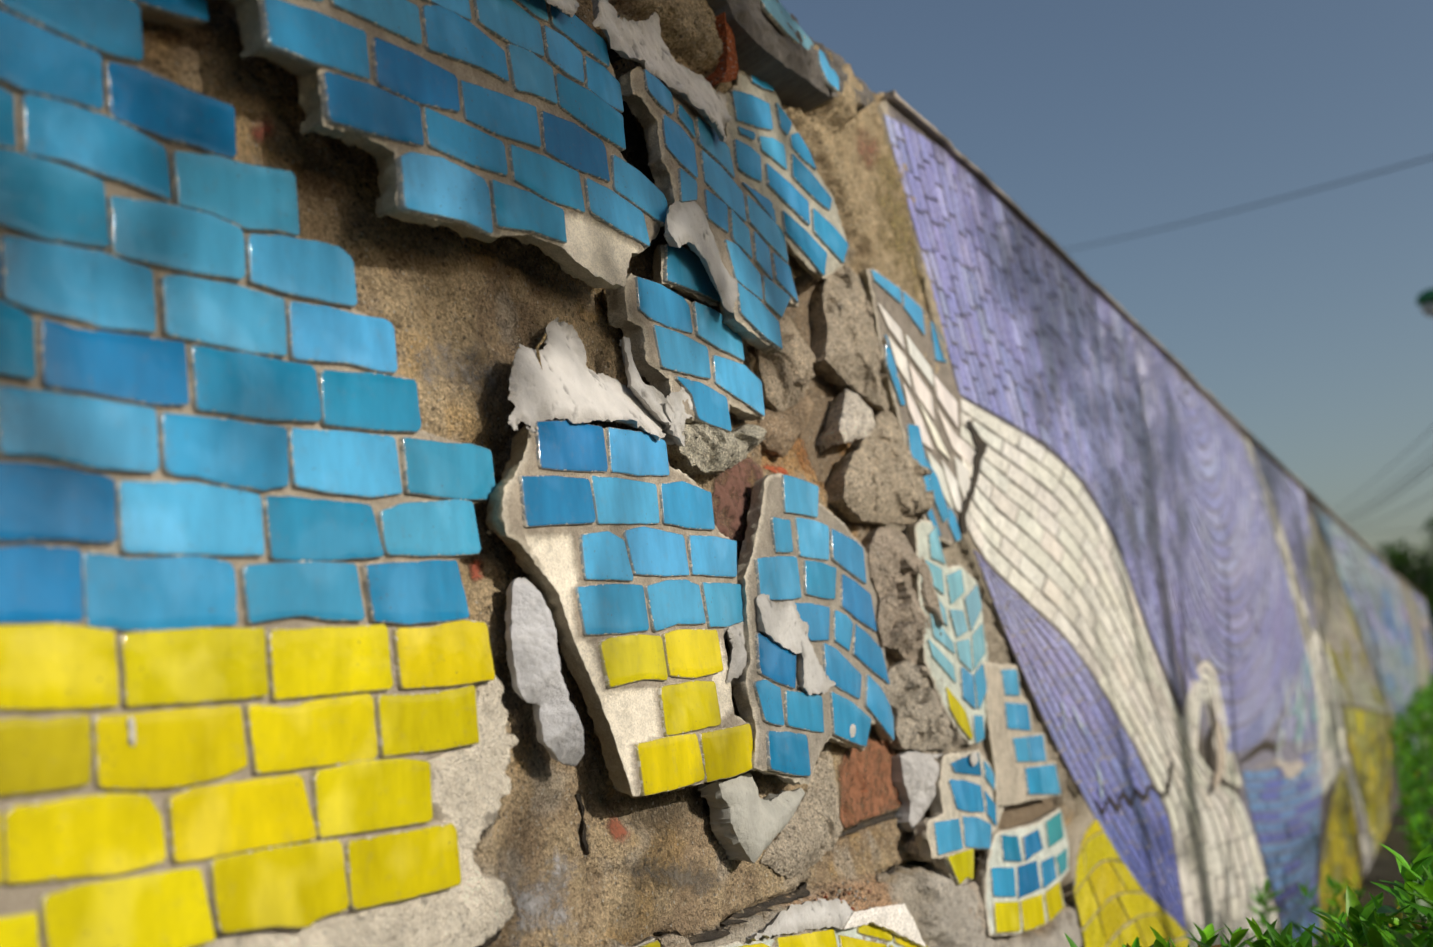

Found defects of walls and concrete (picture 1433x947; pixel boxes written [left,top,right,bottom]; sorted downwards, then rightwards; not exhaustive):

spalling [574,0,739,94]
spalling [138,0,650,486]
spalling [627,226,695,302]
spalling [781,36,948,374]
spalling [742,339,755,375]
spalling [729,412,758,430]
spalling [687,438,913,565]
spalling [196,501,1083,947]
crack [881,860,929,874]
crack [477,928,502,947]
crack [656,882,810,945]